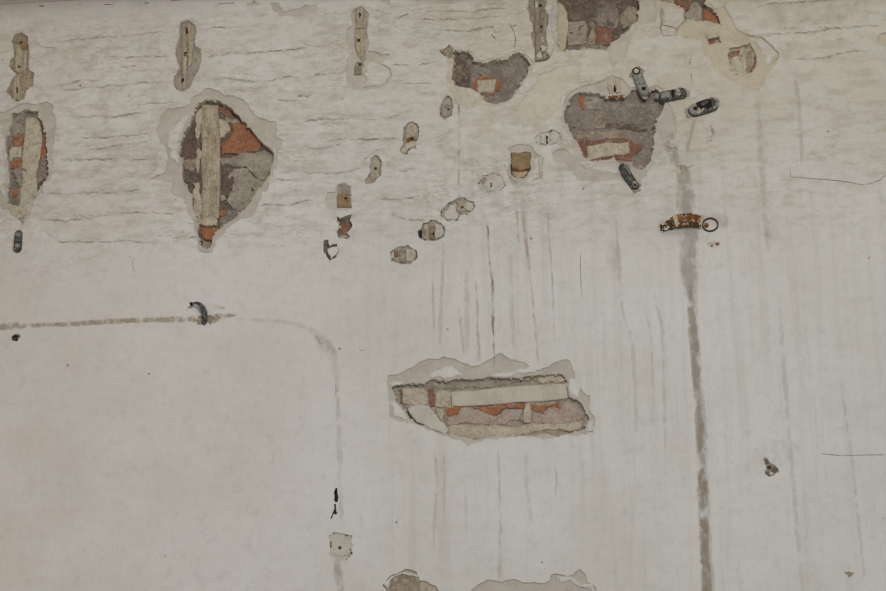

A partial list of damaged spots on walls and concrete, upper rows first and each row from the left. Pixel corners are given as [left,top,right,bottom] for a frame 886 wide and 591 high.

flaking render [440,0,780,183]
flaking render [0,102,56,225]
flaking render [151,88,283,253]
rust [660,213,701,232]
crack [790,171,886,185]
water stain [55,317,182,326]
flaking render [387,353,595,445]
water stain [688,308,709,570]
flaking render [383,569,439,591]
flaking render [471,569,596,591]